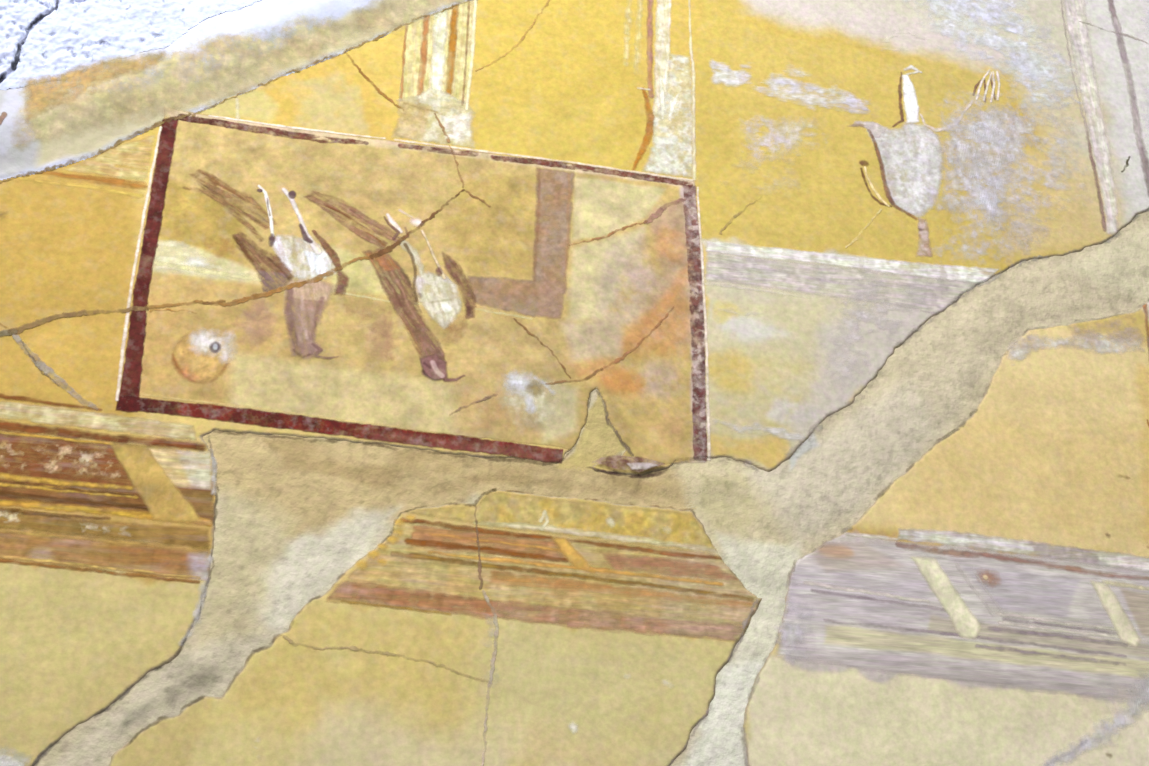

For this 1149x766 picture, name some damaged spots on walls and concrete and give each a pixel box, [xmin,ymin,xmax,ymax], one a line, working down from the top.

crack [0,0,469,183]
crack [475,0,549,71]
crack [0,114,490,406]
crack [513,313,668,384]
crack [583,198,686,242]
flaking render [32,208,1149,766]
crack [283,635,398,656]
crack [425,521,499,766]